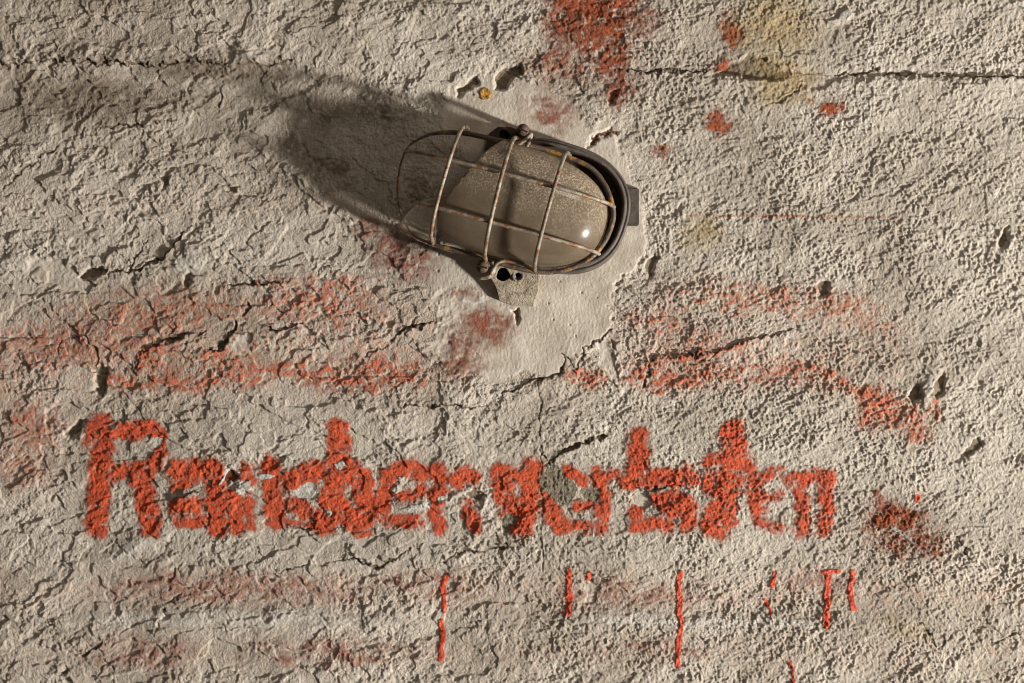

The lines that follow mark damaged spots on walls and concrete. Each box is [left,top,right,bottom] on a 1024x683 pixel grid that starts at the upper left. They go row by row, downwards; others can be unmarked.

crack [0,55,292,108]
flaking render [457,78,478,97]
flaking render [495,66,522,90]
crack [614,60,731,79]
crack [765,61,1024,106]
flaking render [590,129,618,145]
crack [108,231,184,275]
crack [134,280,303,369]
crack [364,321,433,358]
flaking render [598,339,619,383]
crack [403,329,617,572]
crack [339,547,410,570]